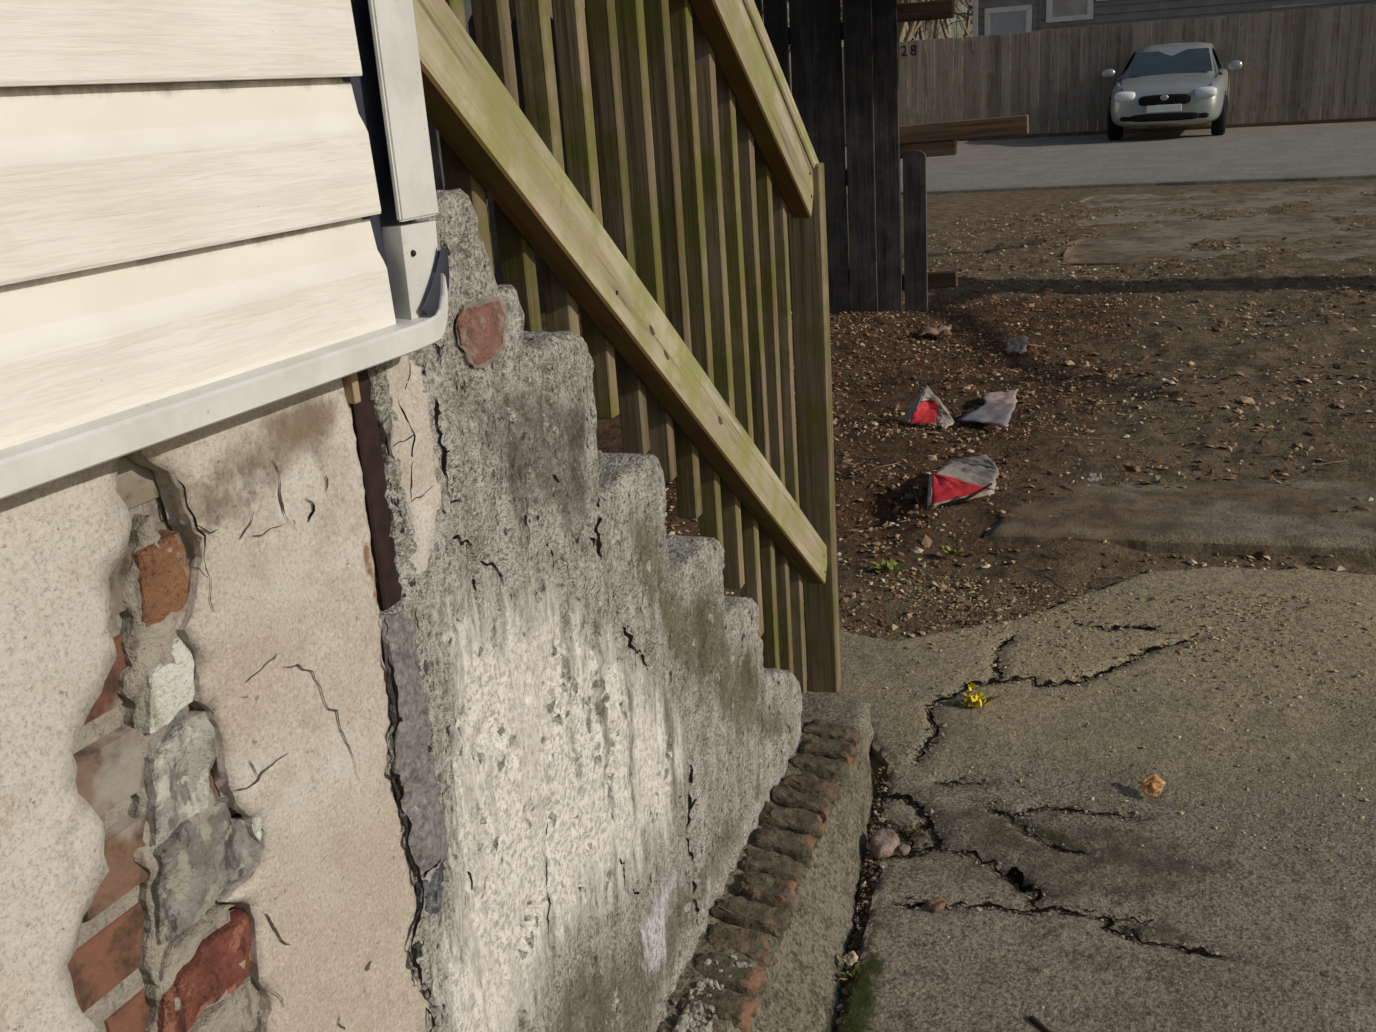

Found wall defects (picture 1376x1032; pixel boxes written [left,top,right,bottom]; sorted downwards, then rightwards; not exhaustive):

crack [176,460,329,612]
crack [623,627,647,666]
spalling [117,514,262,1032]
crack [236,753,288,790]
crack [246,617,473,1032]
crack [544,822,552,941]
crack [686,758,700,927]